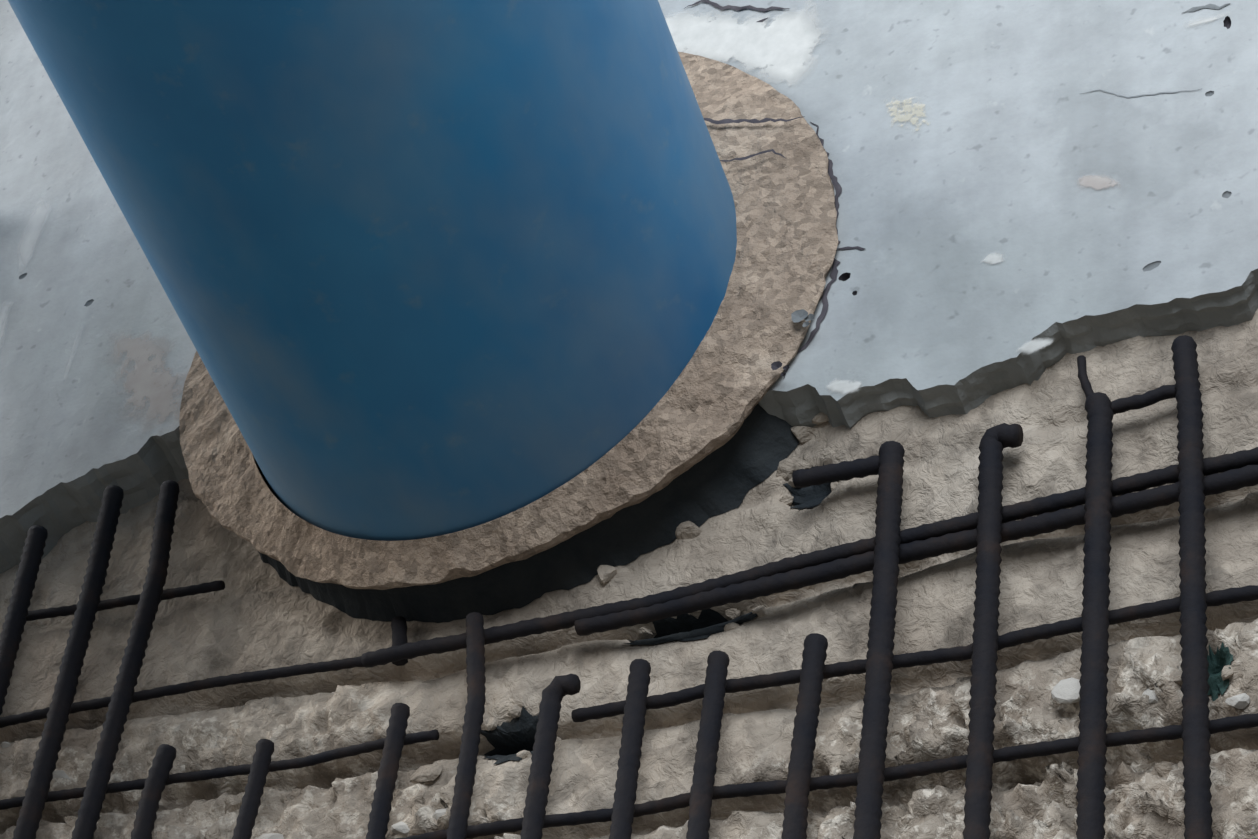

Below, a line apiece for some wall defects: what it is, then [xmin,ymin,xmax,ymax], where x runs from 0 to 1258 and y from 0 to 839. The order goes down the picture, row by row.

crack [684,0,790,22]
peeling [983,253,1002,264]
spalling [1142,261,1161,271]
spalling [0,269,1258,839]